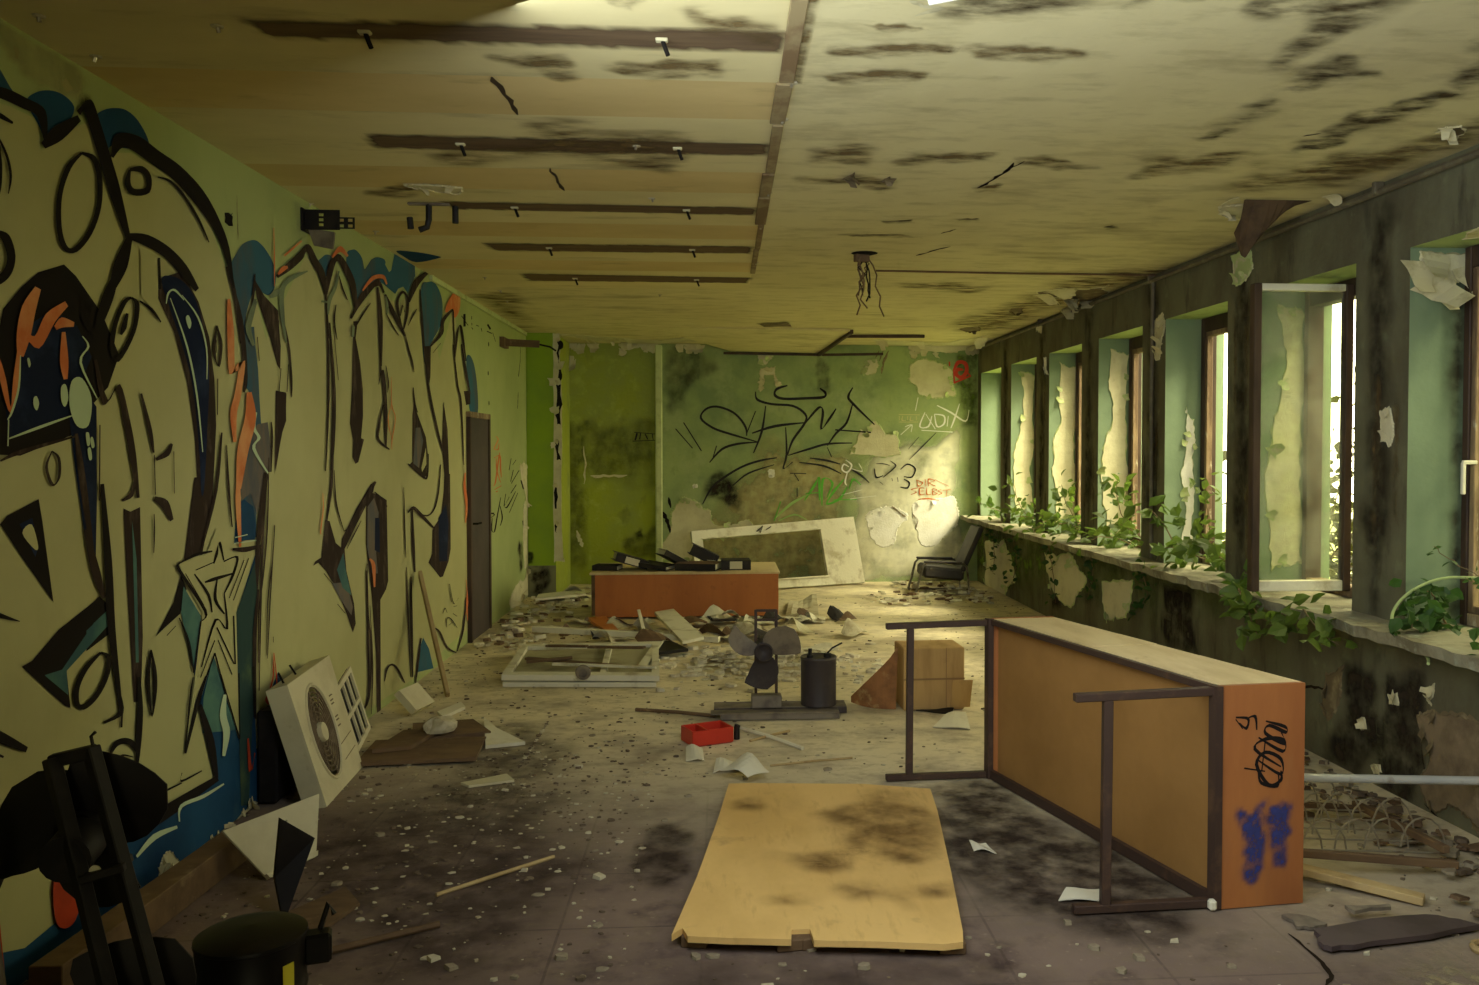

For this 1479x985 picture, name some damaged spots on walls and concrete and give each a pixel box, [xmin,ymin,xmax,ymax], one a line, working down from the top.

damp [251,0,817,80]
damp [826,24,951,81]
damp [368,123,769,168]
damp [1244,69,1479,187]
peeling [1401,227,1479,310]
spalling [861,327,994,399]
damp [703,452,849,578]
peeling [1180,406,1198,541]
peeling [1263,304,1305,571]
peeling [1044,552,1133,623]
damp [1330,667,1423,800]
crack [1288,933,1334,985]